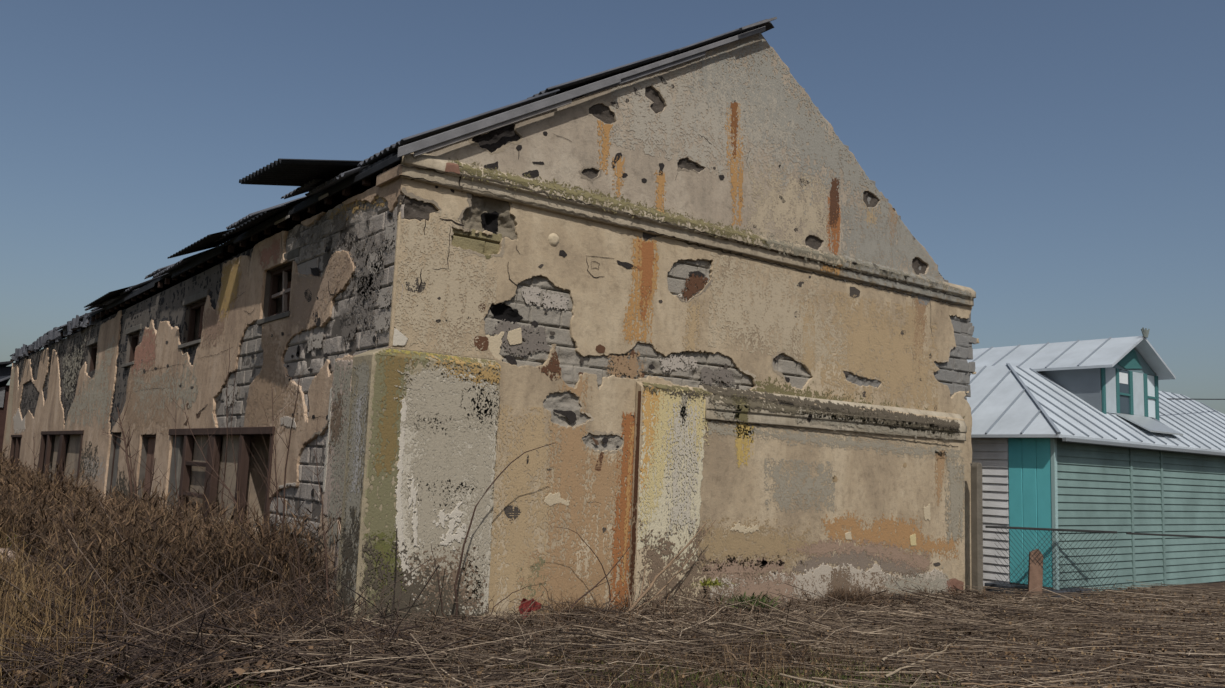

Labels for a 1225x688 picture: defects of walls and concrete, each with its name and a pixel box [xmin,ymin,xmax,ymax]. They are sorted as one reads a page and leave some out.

spalling [13,248,253,434]
spalling [179,186,521,618]
leakage [223,195,557,632]
spalling [468,124,523,170]
leakage [522,285,569,310]
corrosion [597,120,625,198]
corrosion [516,235,711,624]
spalling [468,260,964,613]
corrosion [725,102,746,226]
leakage [609,34,971,613]
corrosion [820,178,842,276]
spalling [920,313,977,400]